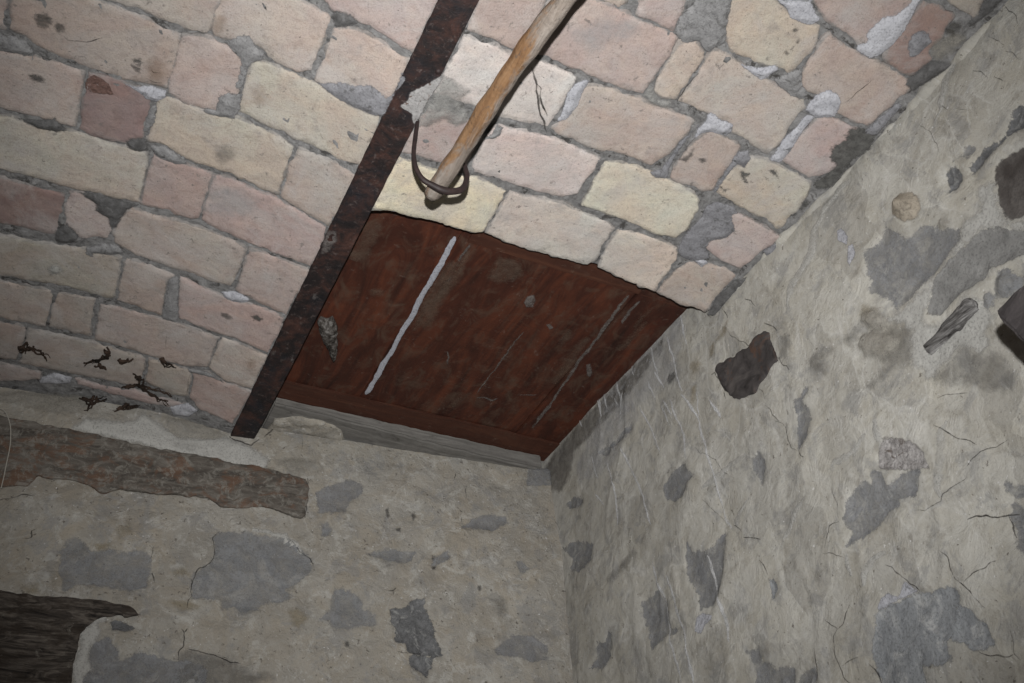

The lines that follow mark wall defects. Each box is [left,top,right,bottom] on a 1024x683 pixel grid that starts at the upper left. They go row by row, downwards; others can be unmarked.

crack [968,514,1018,538]
crack [815,612,881,682]